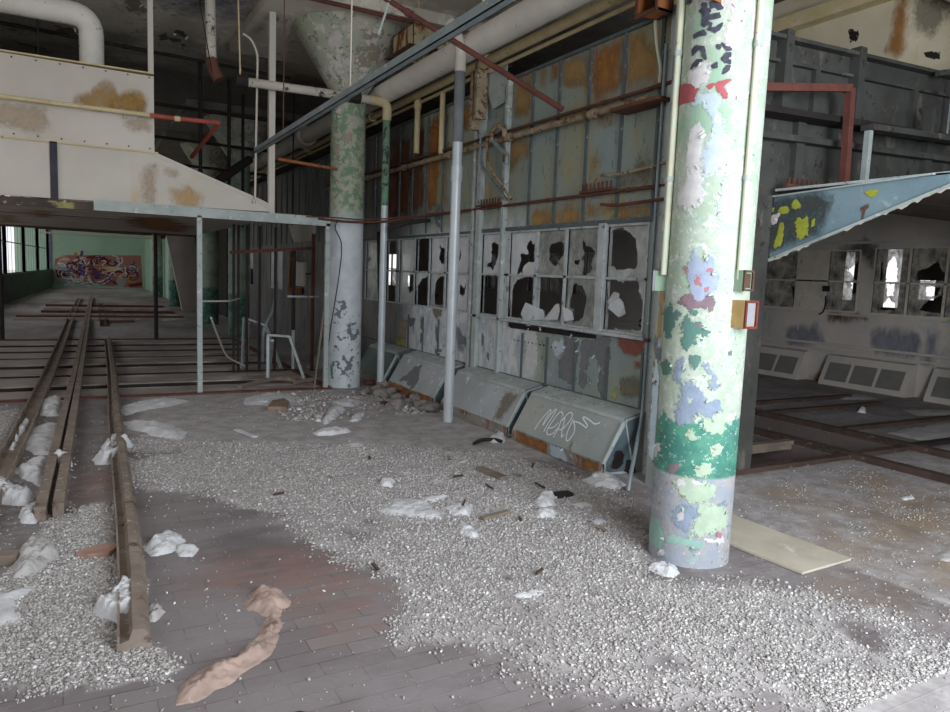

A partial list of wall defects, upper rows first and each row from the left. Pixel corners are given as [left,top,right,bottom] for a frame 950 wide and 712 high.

peeling [328,29,384,74]
corrosion [542,35,657,99]
corrosion [885,0,950,55]
peeling [676,0,757,227]
corrosion [510,140,528,172]
corrosion [532,202,650,225]
peeling [328,300,360,379]
peeling [524,327,541,378]
peeling [551,334,611,399]
peeling [647,249,730,556]
corrosion [516,431,547,453]
corrosion [582,459,598,471]